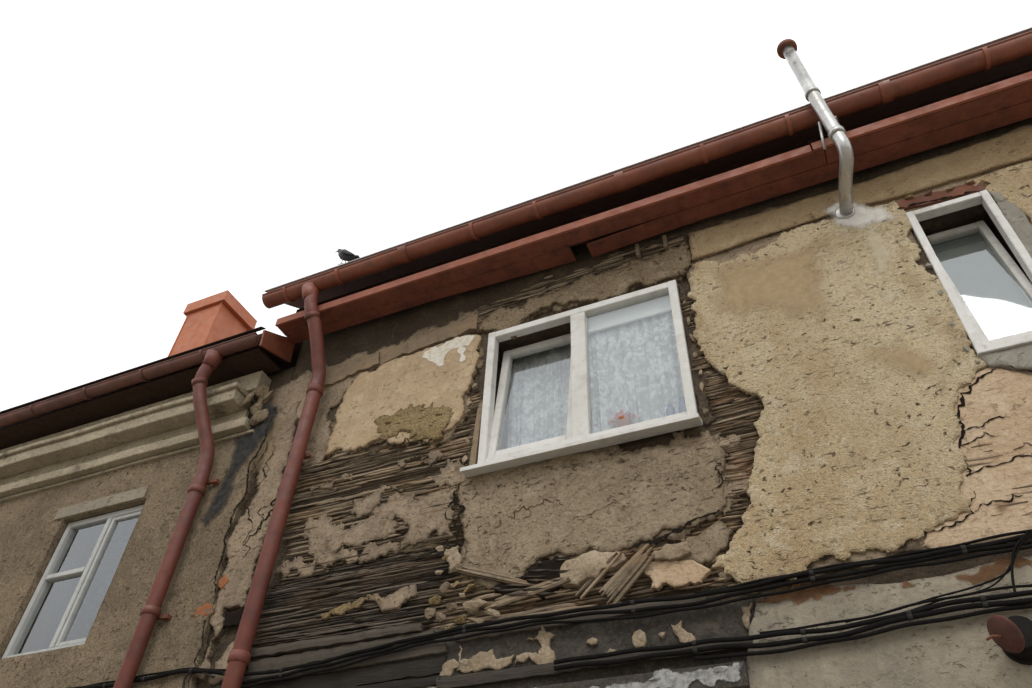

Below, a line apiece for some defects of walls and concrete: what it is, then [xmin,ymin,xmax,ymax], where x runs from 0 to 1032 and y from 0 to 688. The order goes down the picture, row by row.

crack [188,420,279,688]
spalling [239,384,274,426]
spalling [247,234,764,676]
crack [889,365,1032,554]
peeling [590,662,741,688]